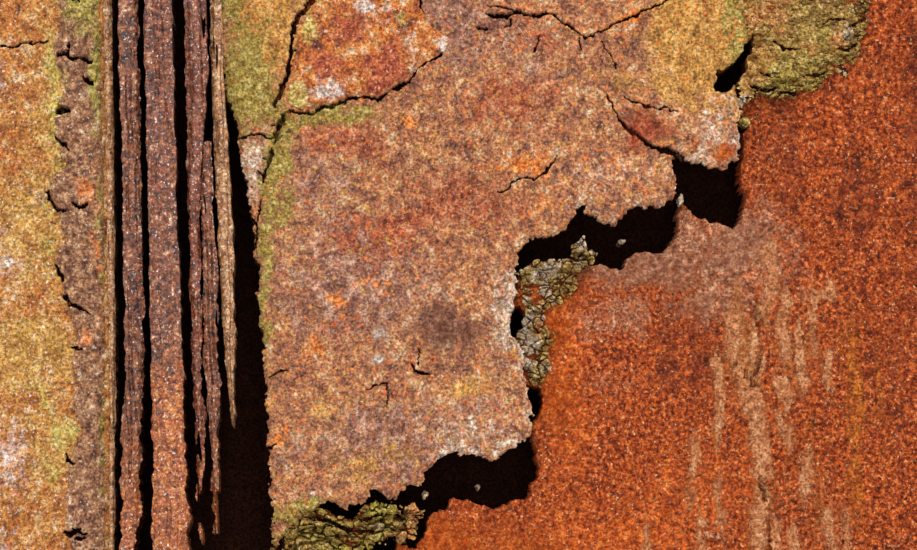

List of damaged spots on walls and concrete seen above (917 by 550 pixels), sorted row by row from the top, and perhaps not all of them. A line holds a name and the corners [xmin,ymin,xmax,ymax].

crack [476,0,668,69]
crack [238,0,443,249]
crack [606,94,685,160]
rust [623,108,675,150]
rust [717,144,737,161]
peeling [50,0,106,550]
water stain [602,253,685,290]
rust [537,311,571,352]
rust [541,376,571,427]
water stain [698,220,850,550]
water stain [689,431,701,482]
water stain [690,474,728,550]